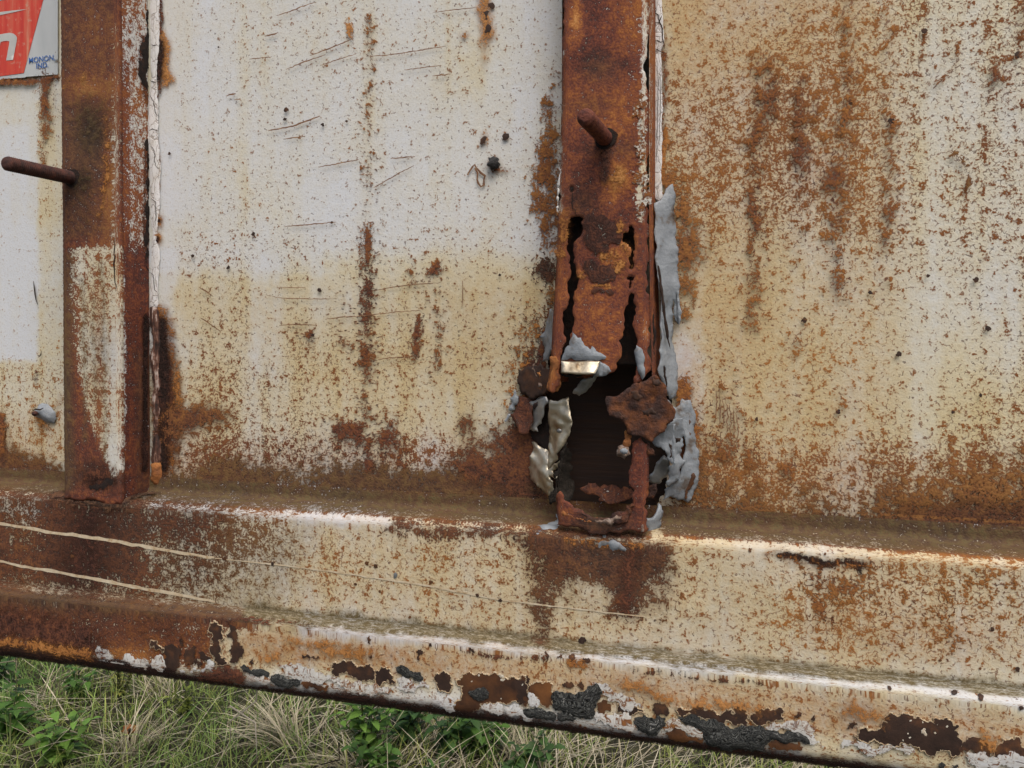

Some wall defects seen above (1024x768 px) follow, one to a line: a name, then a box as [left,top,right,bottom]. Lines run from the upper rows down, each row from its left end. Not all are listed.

corrosion [135,0,175,104]
corrosion [320,8,412,475]
corrosion [441,64,638,499]
corrosion [720,1,905,371]
peeling [634,345,645,380]
corrosion [0,488,236,665]
corrosion [380,503,682,645]
peeling [536,514,559,534]
peeling [646,503,663,531]
peeling [95,615,348,685]
peeling [278,636,824,747]
peeling [841,712,1024,768]